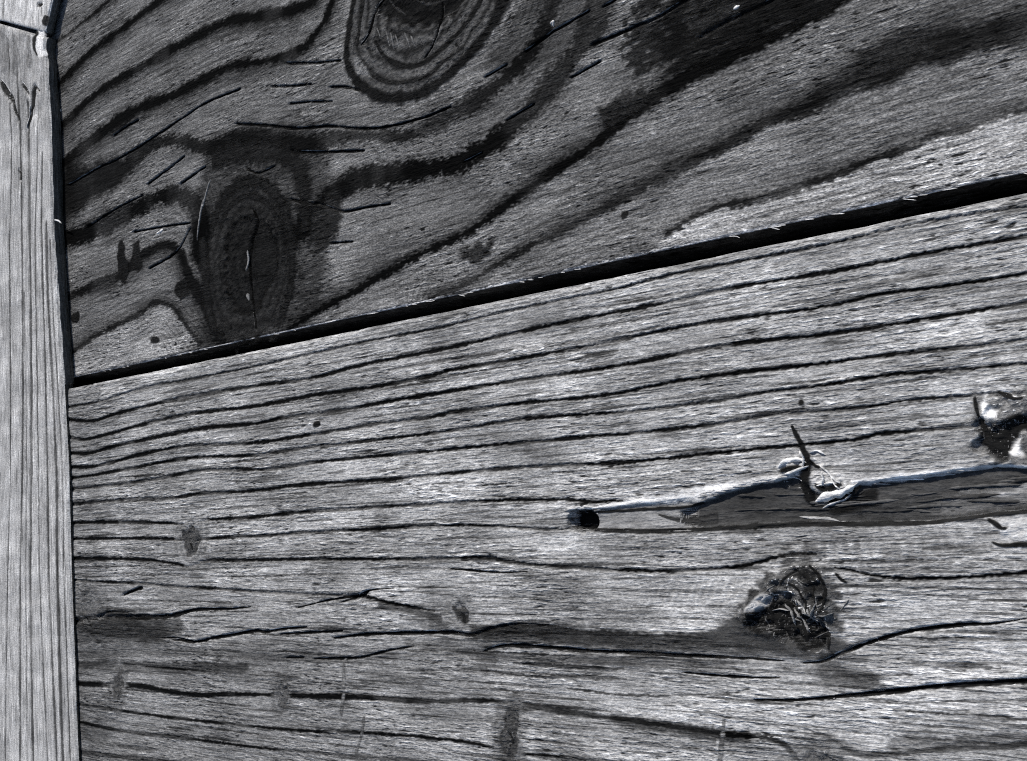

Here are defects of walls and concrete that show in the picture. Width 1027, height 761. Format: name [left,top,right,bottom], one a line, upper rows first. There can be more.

leakage [598,0,852,128]
crack [75,586,1027,702]